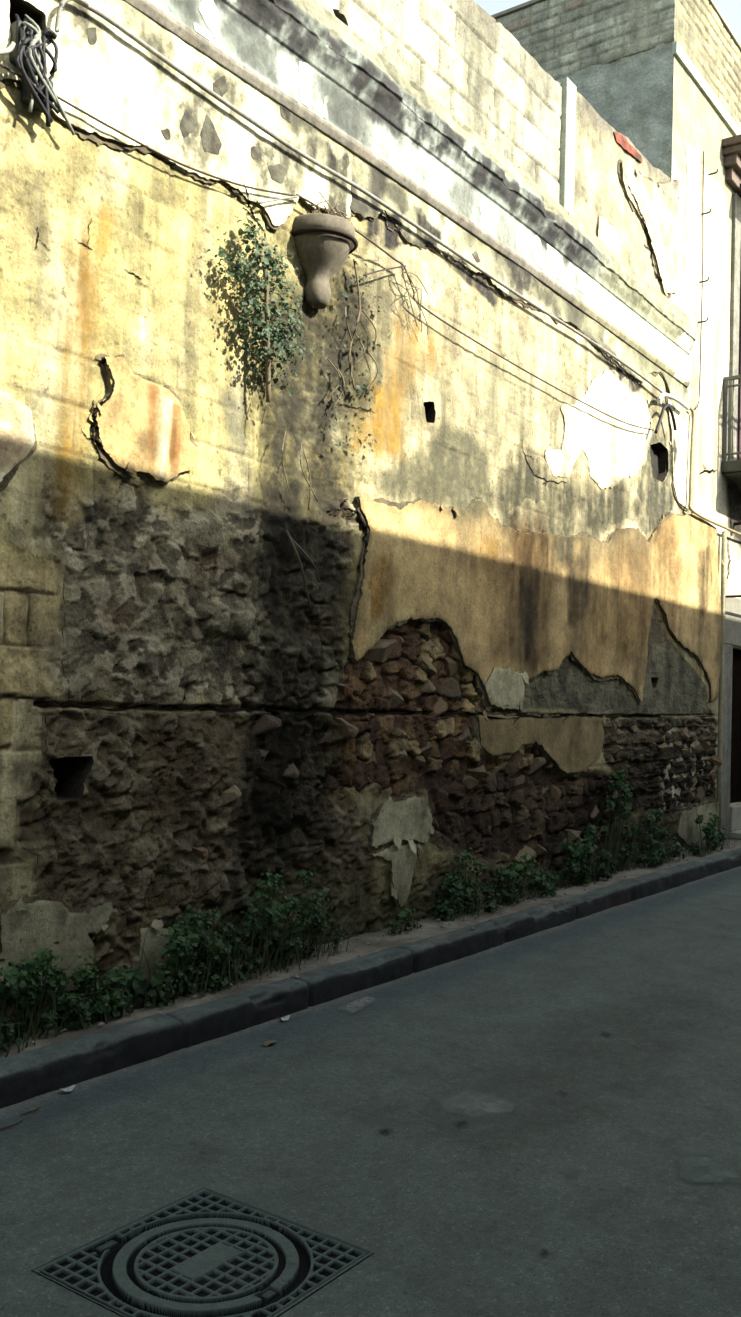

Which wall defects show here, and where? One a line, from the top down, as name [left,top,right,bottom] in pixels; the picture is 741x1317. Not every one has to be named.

damp [74,3,90,38]
damp [142,25,170,70]
damp [176,0,197,13]
damp [178,69,243,167]
damp [227,11,278,82]
damp [321,78,358,134]
crack [621,166,662,289]
flaking render [0,0,727,848]
damp [243,264,371,880]
damp [381,423,677,606]
spalling [0,354,332,999]
flaking render [366,792,434,910]